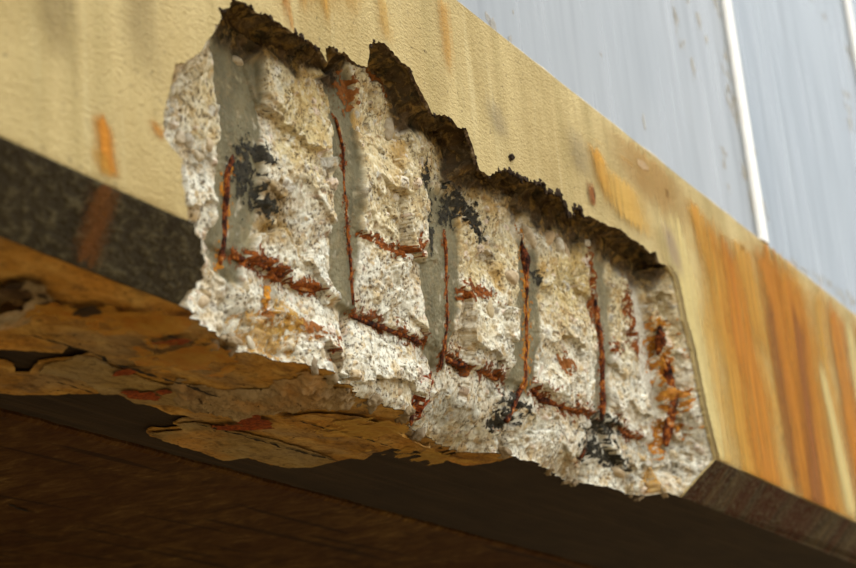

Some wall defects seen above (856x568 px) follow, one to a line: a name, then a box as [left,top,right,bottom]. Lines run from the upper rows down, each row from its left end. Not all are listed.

rust [332,68,392,118]
rust [96,116,116,176]
rust [588,146,668,231]
spalling [0,0,713,502]
rust [355,230,429,261]
rust [455,277,507,305]
rust [555,351,579,377]
rust [585,237,598,331]
rust [606,276,642,363]
rust [687,197,856,520]
rust [316,374,434,452]
rust [395,447,484,465]